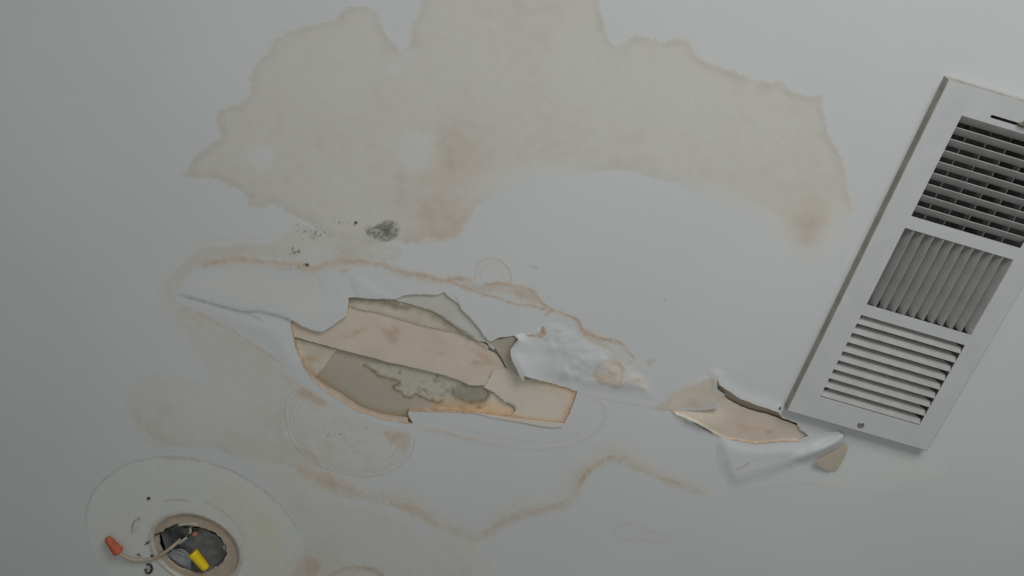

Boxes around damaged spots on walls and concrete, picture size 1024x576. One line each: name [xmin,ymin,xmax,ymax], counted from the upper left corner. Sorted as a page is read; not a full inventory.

mould [335,220,398,241]
peeling [291,292,577,428]
peeling [652,374,848,471]